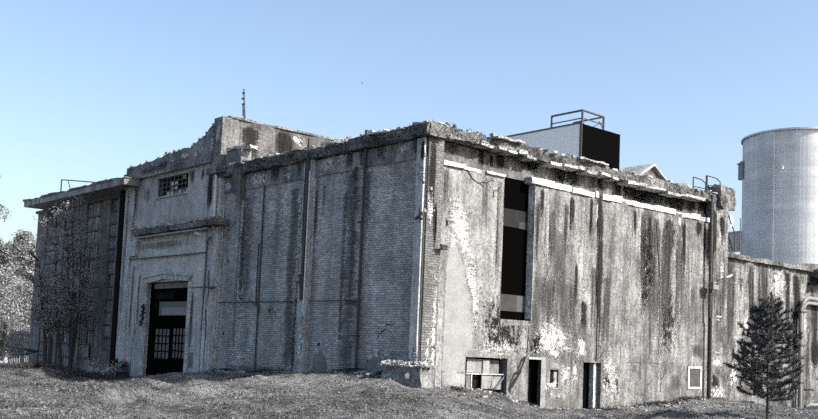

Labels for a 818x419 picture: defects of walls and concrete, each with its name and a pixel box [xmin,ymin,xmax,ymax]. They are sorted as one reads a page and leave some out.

damp [242,127,259,160]
damp [275,132,293,154]
damp [238,180,305,372]
damp [338,173,392,368]
peeling [449,195,563,359]
damp [537,189,575,268]
flaking render [545,338,585,390]
damp [564,180,610,350]
damp [616,184,738,356]
damp [749,264,766,323]
damp [786,273,818,369]